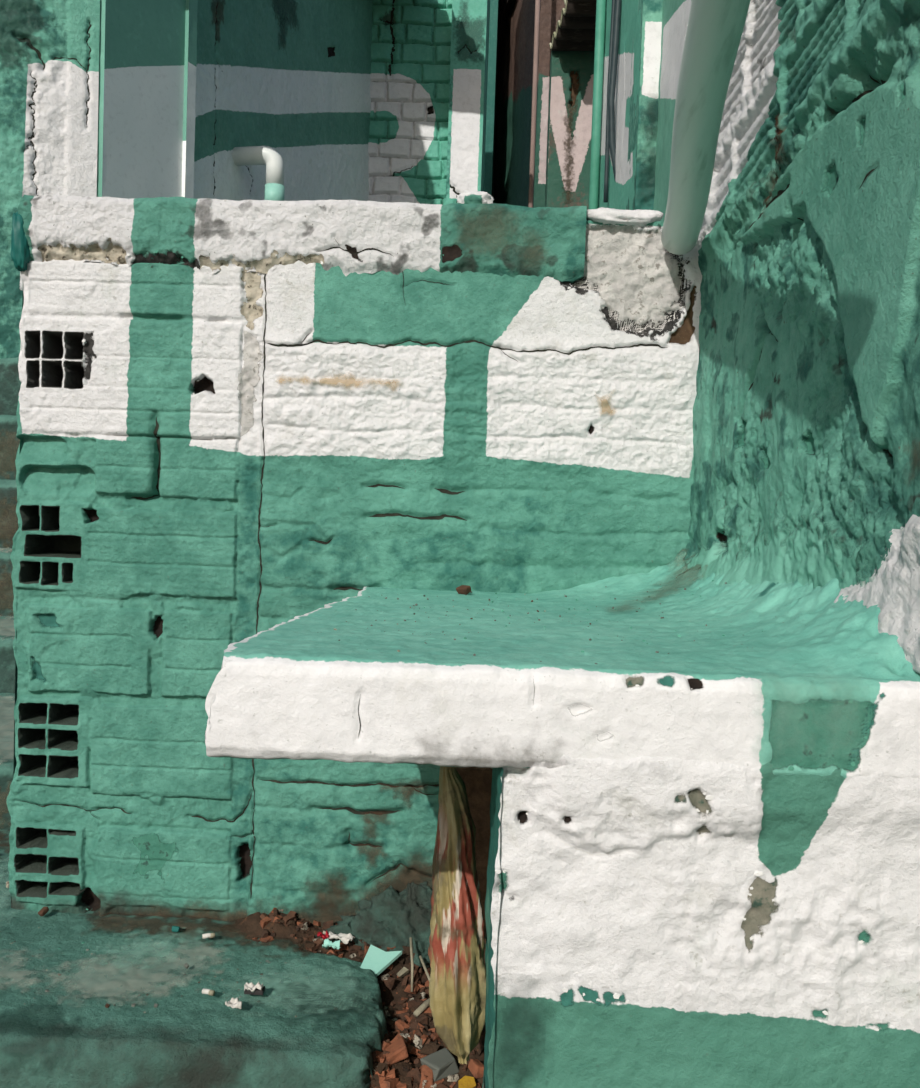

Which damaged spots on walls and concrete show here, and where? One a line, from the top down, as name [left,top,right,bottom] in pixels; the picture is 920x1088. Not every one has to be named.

crack [378,0,395,76]
crack [17,22,91,195]
spalling [38,238,324,436]
crack [316,237,449,301]
spalling [571,224,697,344]
crack [131,417,161,500]
crack [256,274,668,634]
damp [294,863,433,929]